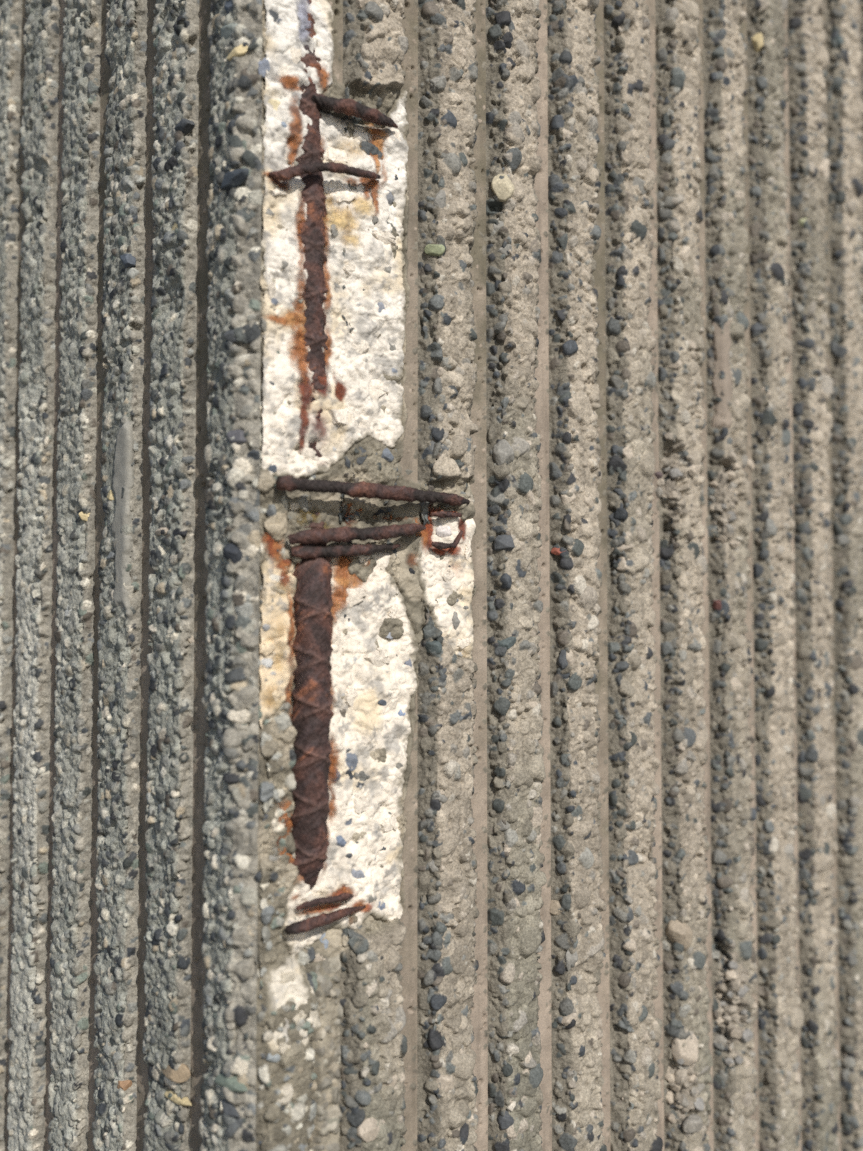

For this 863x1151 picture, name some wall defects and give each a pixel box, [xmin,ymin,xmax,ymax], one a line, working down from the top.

flaking render [226,44,248,61]
rust [281,75,300,90]
rust [287,105,302,164]
flaking render [221,168,249,191]
rust [350,125,387,213]
spalling [258,0,410,479]
rust [268,271,346,448]
flaking render [226,429,247,445]
rust [263,533,291,585]
rust [331,556,362,620]
rust [415,508,466,555]
spalling [258,507,477,1063]